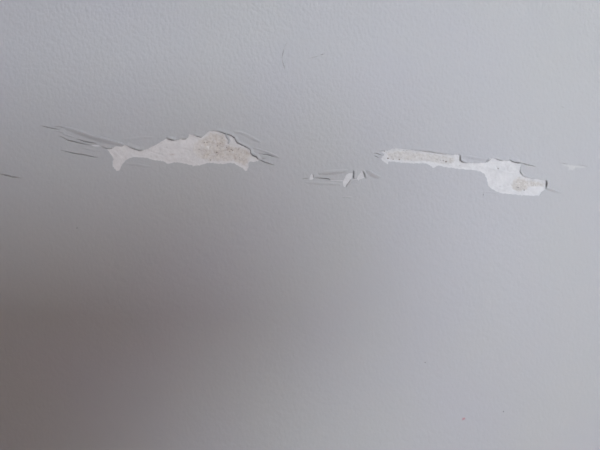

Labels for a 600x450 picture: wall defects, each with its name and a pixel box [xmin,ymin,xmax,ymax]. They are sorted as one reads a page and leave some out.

crack [40,125,109,158]
peeling [107,127,262,171]
peeling [379,147,551,196]